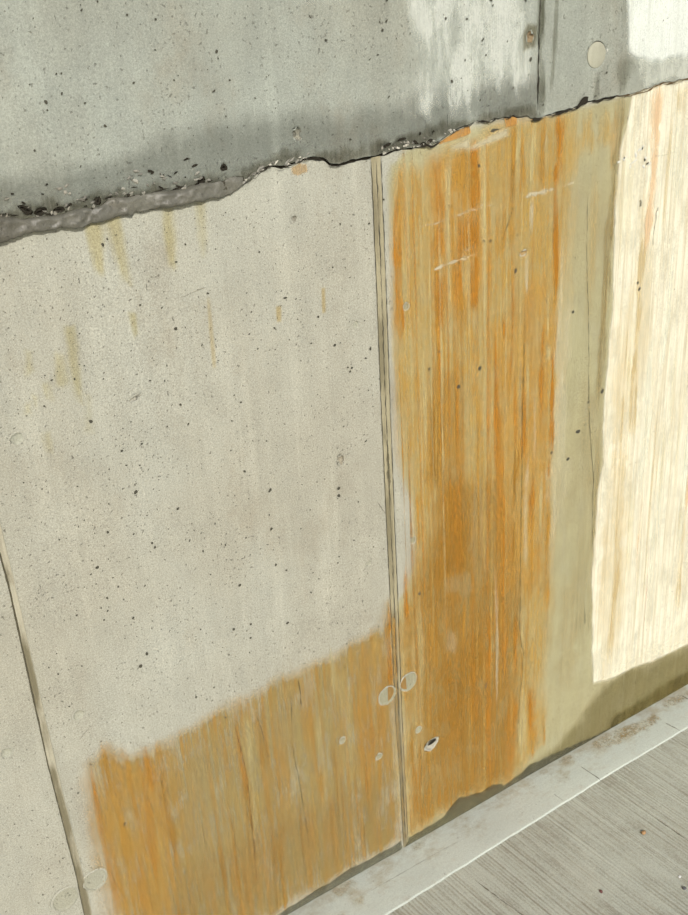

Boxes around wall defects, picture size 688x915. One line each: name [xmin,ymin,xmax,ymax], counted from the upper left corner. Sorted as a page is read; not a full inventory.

crack [245,78,688,184]
spalling [0,202,72,216]
corrosion [93,117,567,915]